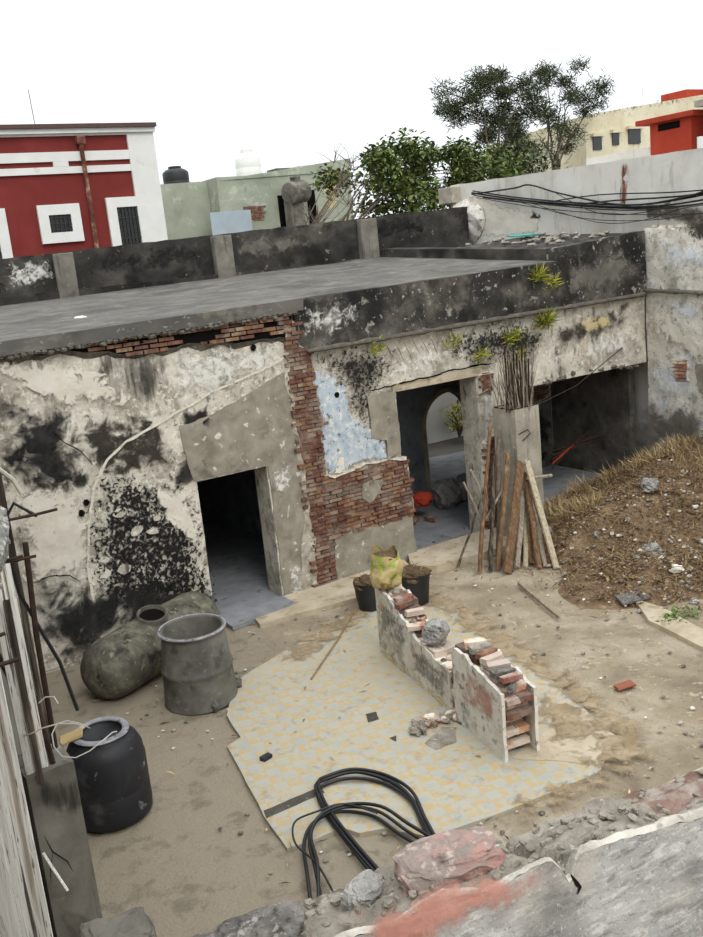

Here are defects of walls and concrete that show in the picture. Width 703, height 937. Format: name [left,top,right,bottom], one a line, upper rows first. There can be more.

water stain [647,203,703,239]
water stain [445,317,545,368]
water stain [558,303,628,365]
spalling [0,310,416,609]
water stain [0,356,190,661]
water stain [142,460,201,551]